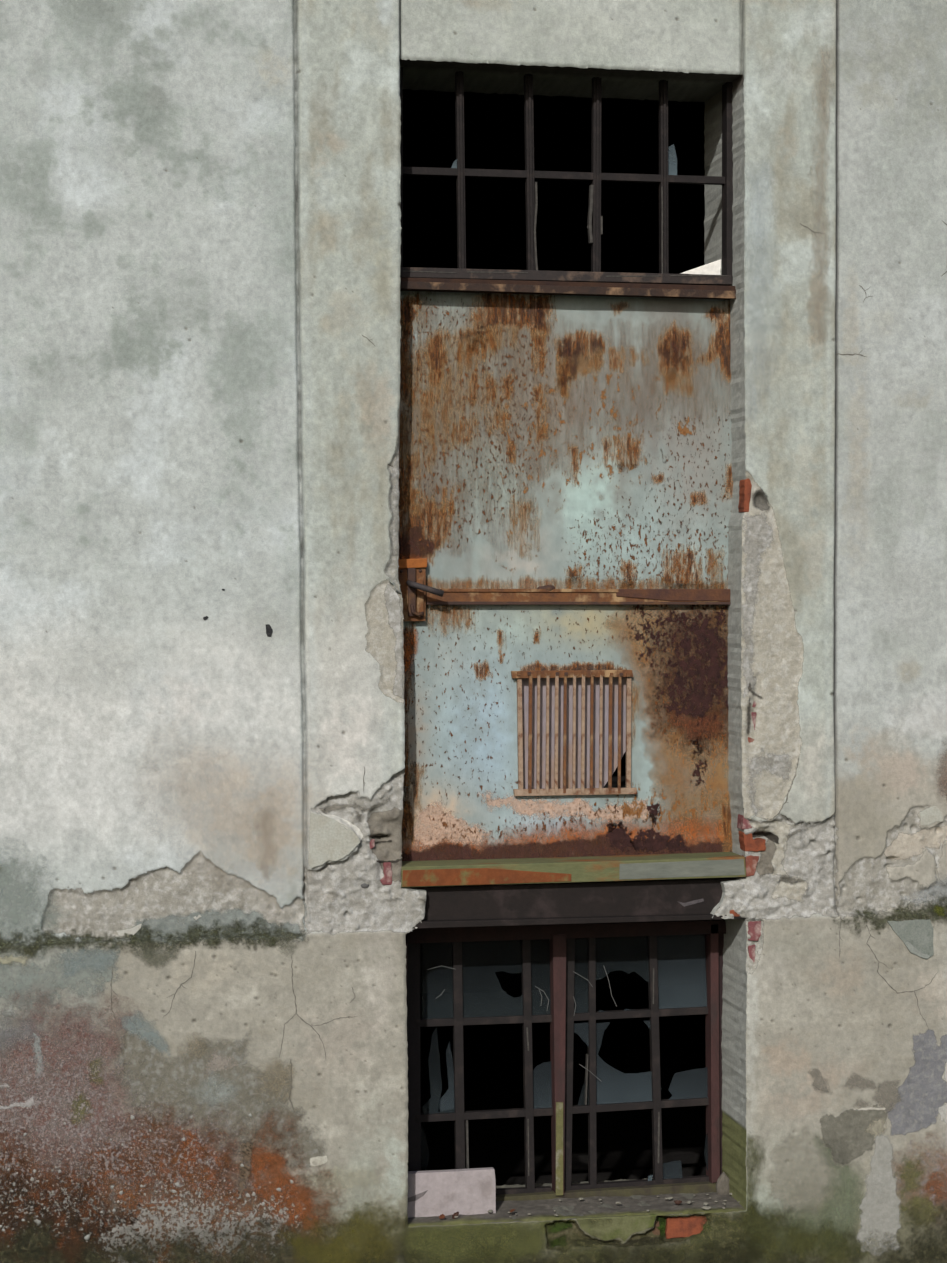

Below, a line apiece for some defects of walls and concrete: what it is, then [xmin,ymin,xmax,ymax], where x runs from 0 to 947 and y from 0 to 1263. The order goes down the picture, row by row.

corrosion [398,293,733,589]
spalling [365,405,405,703]
corrosion [401,605,733,861]
spalling [714,471,947,974]
spalling [42,769,654,945]
crack [279,955,356,1121]
peeling [810,1069,829,1092]
peeling [820,1030,947,1164]
spalling [545,1206,711,1250]
leakage [857,1135,901,1254]